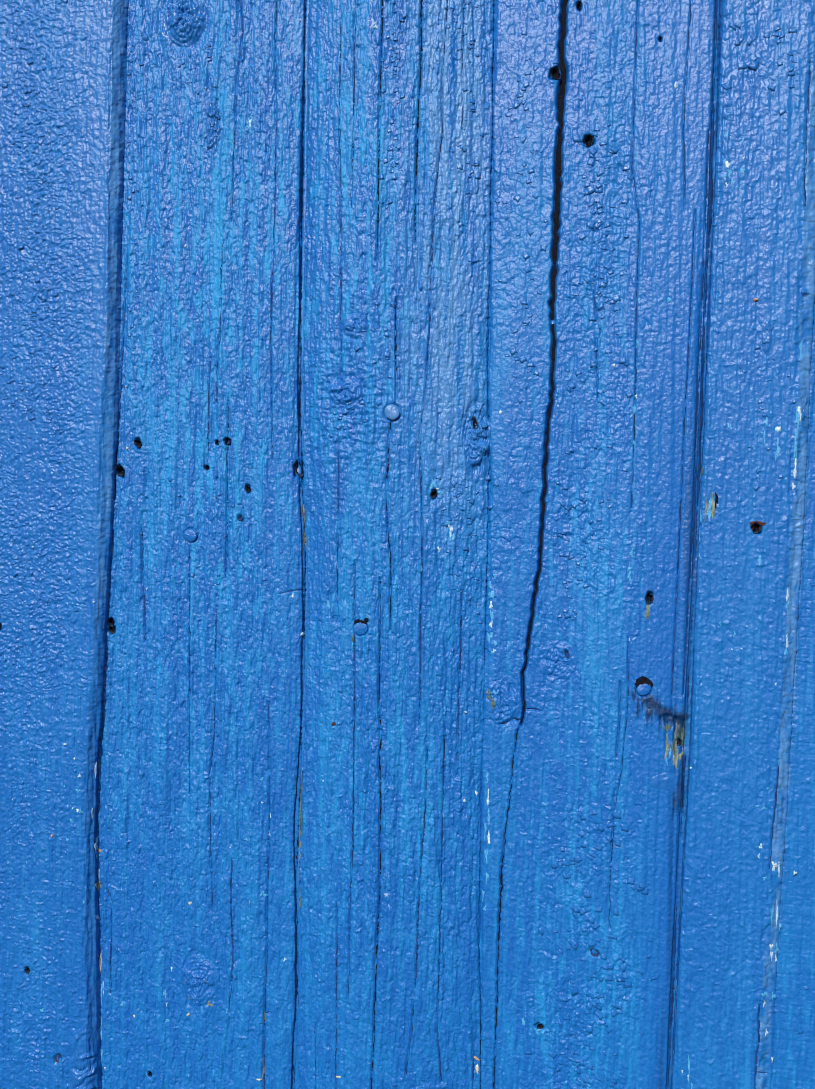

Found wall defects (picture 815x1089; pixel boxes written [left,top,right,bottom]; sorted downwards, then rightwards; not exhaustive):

crack [314,422,392,1089]
crack [339,0,383,380]
crack [391,299,399,381]
crack [406,0,465,1081]
crack [472,0,568,1088]